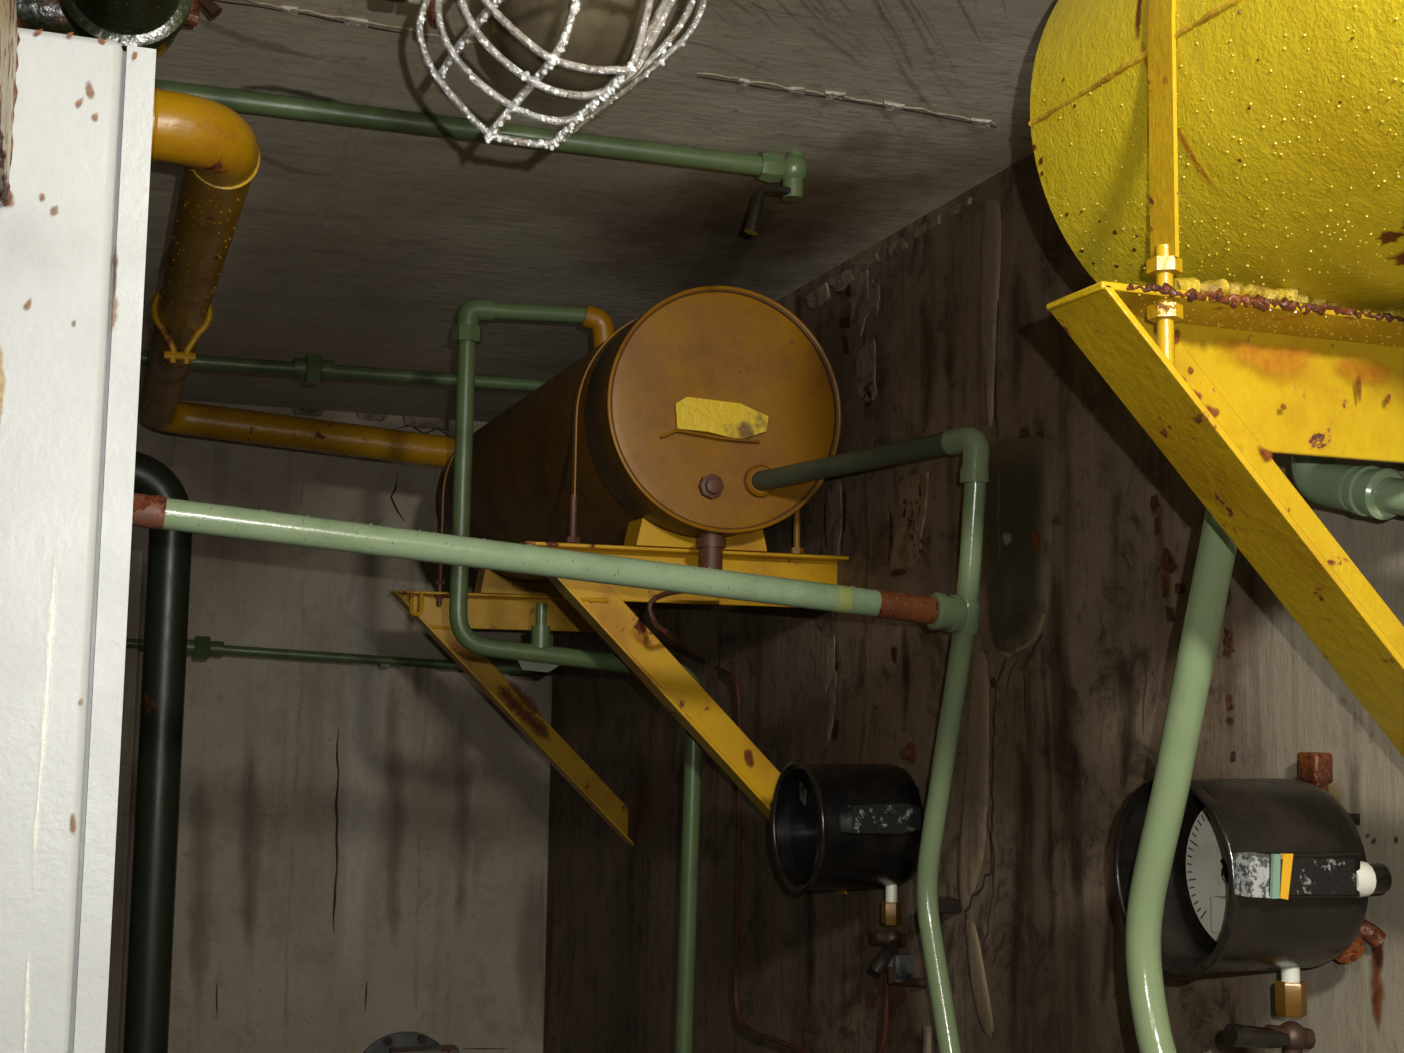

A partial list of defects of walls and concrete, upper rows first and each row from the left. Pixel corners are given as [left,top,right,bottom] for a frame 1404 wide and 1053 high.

corrosion [76,84,98,121]
peeling [805,198,972,407]
peeling [888,471,929,577]
crack [332,731,340,930]